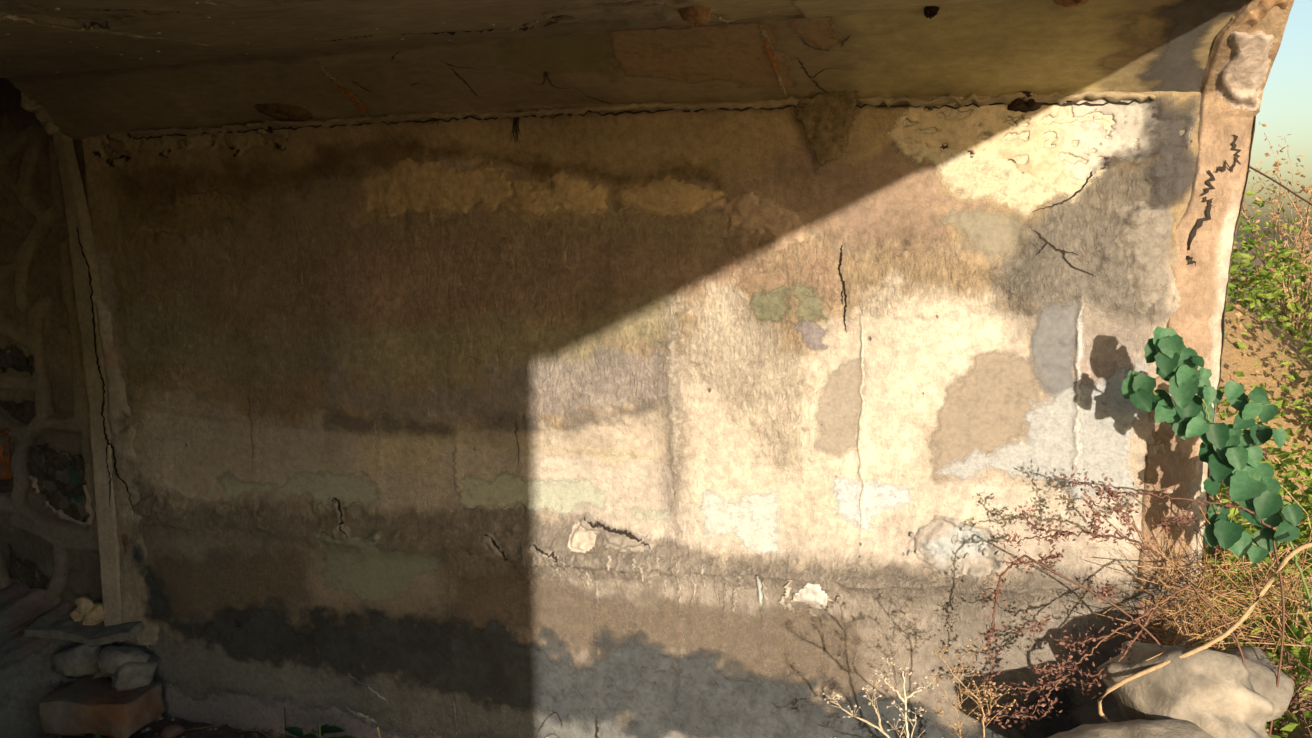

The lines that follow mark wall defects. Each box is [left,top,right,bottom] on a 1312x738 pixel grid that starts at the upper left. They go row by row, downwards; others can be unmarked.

crack [1031,170,1096,277]
water stain [735,273,828,350]
crack [838,245,847,332]
crack [76,227,135,513]
water stain [325,410,452,437]
spalling [526,512,654,564]
water stain [133,530,1080,738]
flaking render [778,580,840,618]